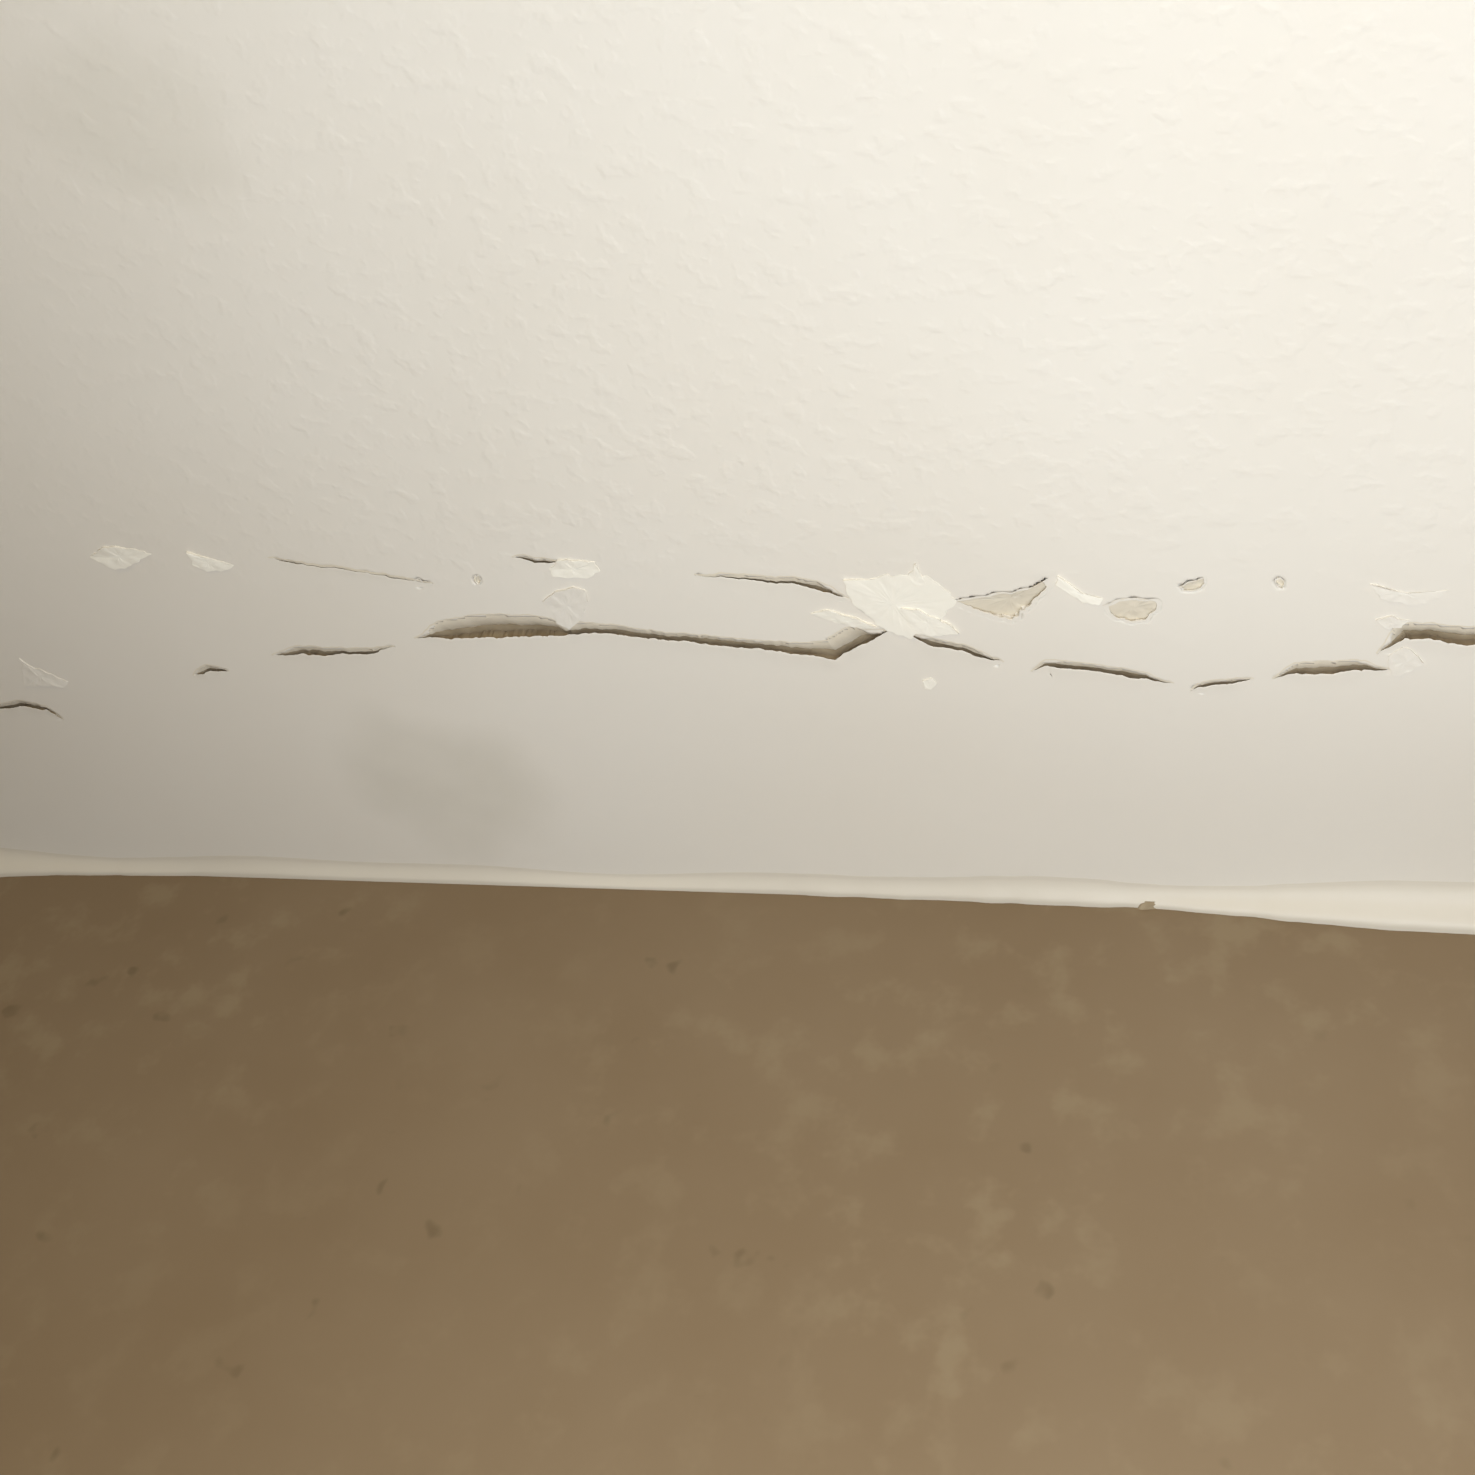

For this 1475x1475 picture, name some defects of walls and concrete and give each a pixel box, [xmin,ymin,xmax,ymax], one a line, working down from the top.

peeling [90,546,151,570]
peeling [186,551,233,572]
crack [268,557,434,588]
peeling [811,563,1162,639]
crack [271,572,1475,697]
crack [0,700,64,720]